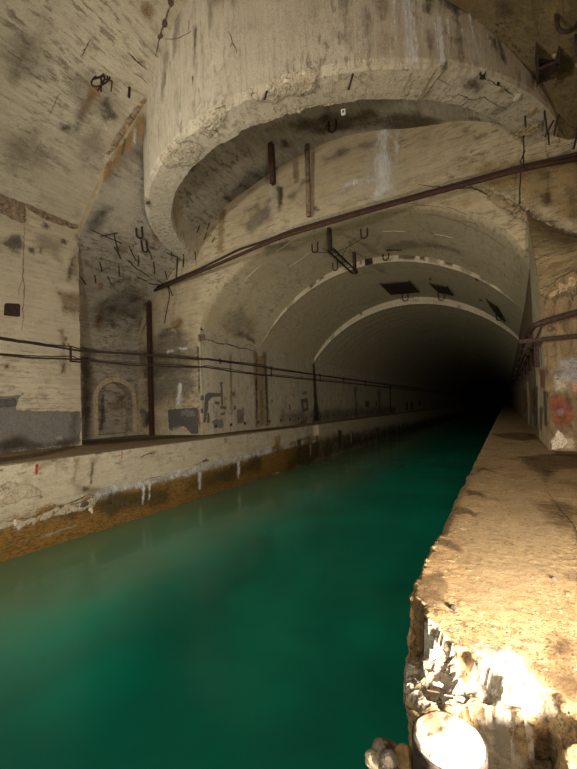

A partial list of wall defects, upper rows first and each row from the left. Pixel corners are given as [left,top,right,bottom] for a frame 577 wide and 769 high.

water stain [392,0,418,62]
water stain [426,0,478,65]
water stain [292,111,436,199]
spalling [0,193,78,229]
spalling [540,268,577,298]
water stain [0,414,458,563]
spalling [404,619,474,721]